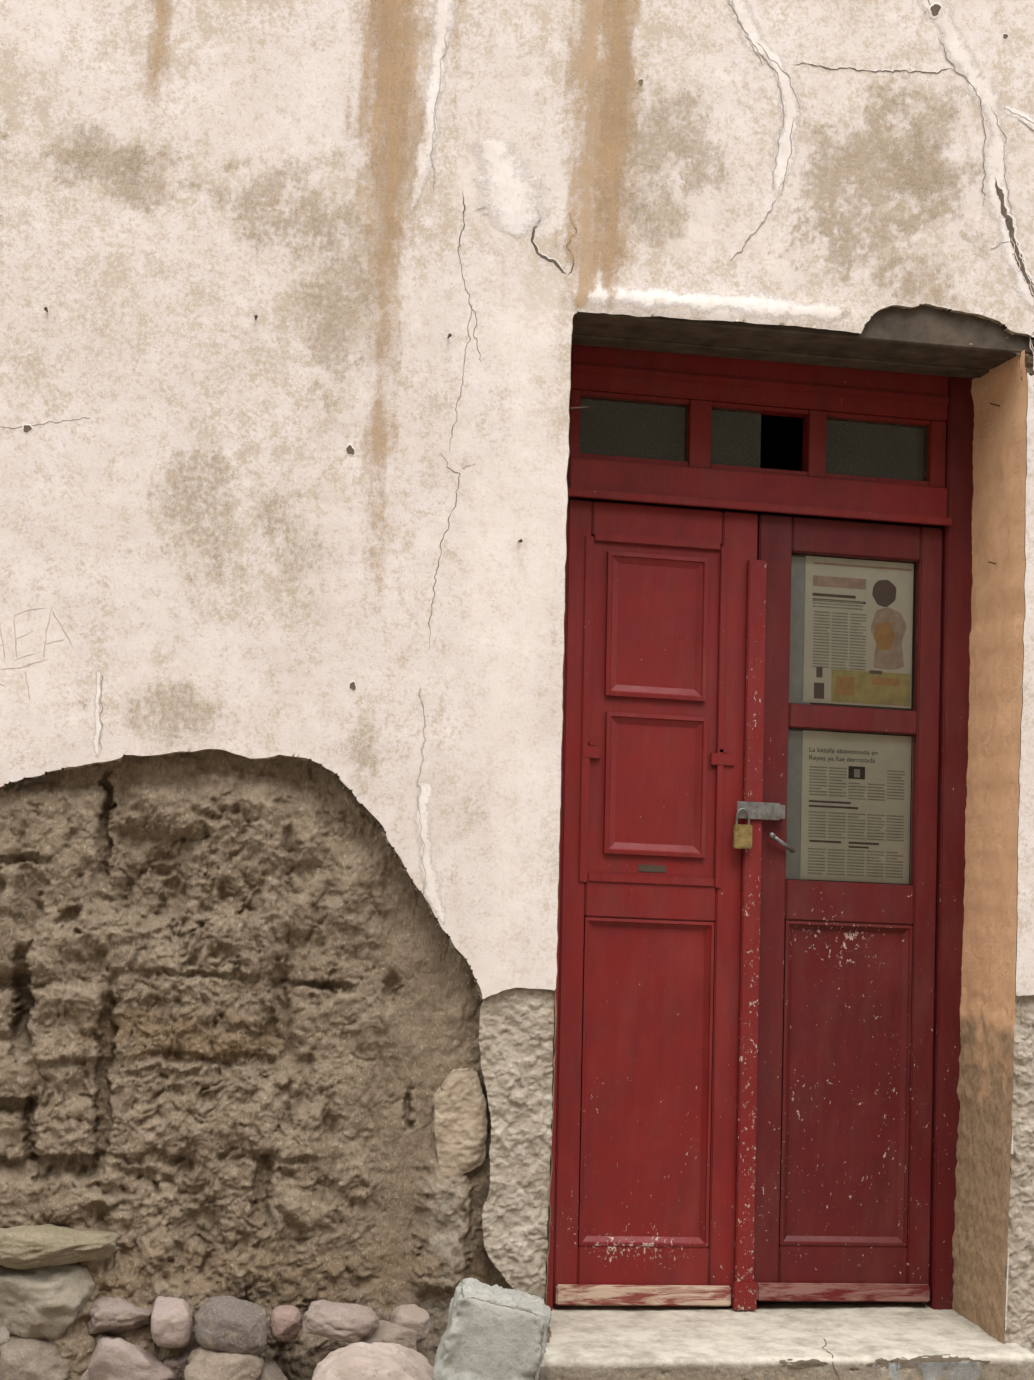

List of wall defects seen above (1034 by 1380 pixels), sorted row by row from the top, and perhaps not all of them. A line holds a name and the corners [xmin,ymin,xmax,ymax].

damp [42,0,427,474]
crack [409,0,481,646]
crack [530,206,578,276]
damp [566,0,724,309]
crack [727,0,1034,407]
flaking render [874,303,1034,384]
crack [415,689,446,924]
flaking render [0,749,513,1380]